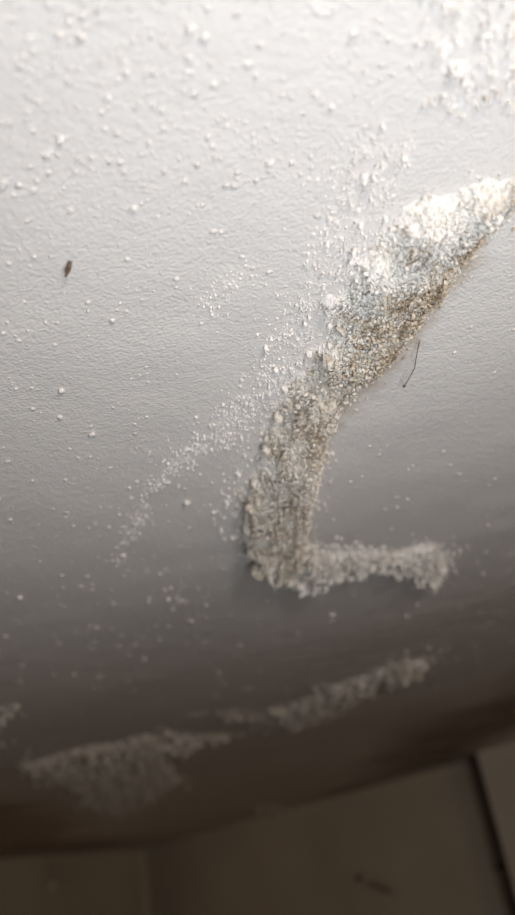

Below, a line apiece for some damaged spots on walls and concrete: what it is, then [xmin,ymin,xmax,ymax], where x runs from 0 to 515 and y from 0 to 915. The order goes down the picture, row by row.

damp [218,168,515,598]
damp [0,647,456,823]